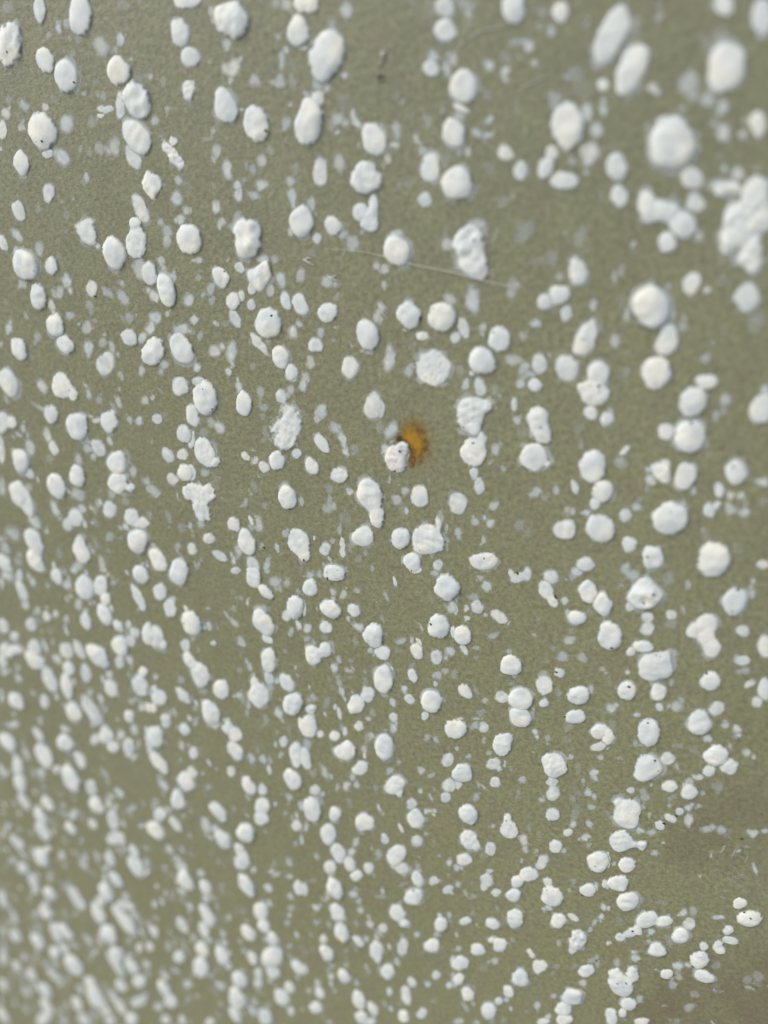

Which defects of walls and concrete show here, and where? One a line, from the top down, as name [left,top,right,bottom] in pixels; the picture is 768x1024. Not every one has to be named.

corrosion [396,423,426,466]